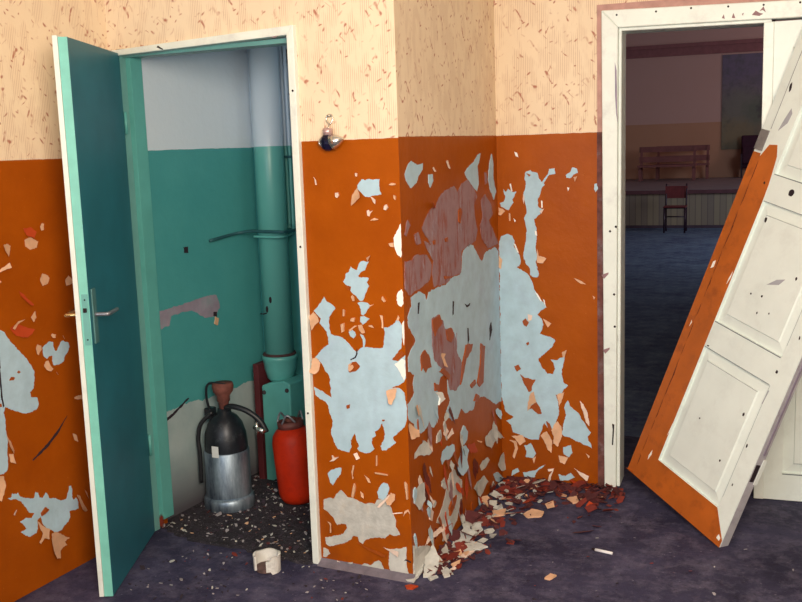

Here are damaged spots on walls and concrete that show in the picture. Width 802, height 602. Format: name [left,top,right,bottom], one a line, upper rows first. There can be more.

peeling [23,223,44,250]
peeling [0,291,89,559]
peeling [309,153,592,574]